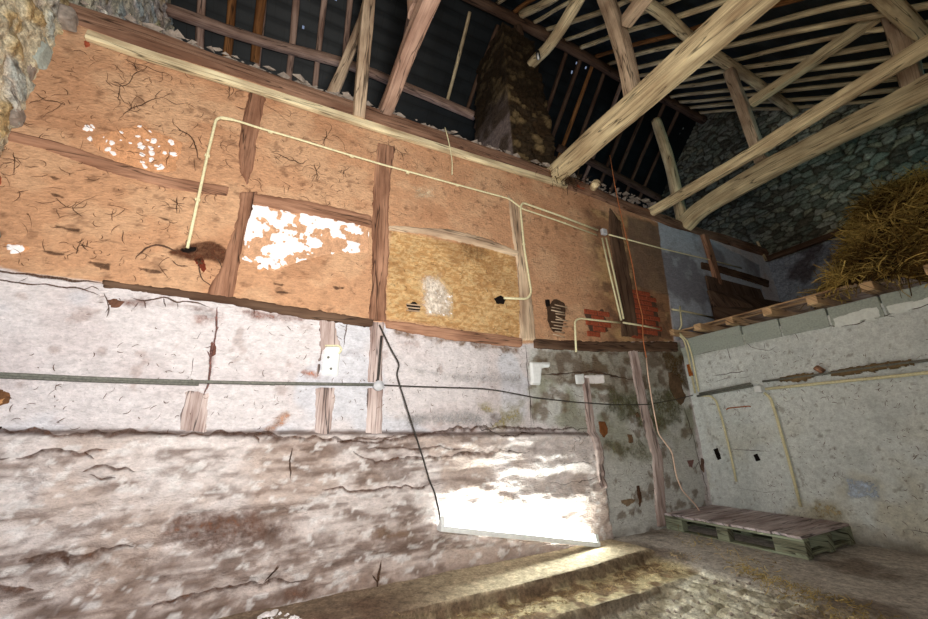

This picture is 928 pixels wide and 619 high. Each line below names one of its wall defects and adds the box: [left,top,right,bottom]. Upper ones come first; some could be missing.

peeling [82,124,183,172]
peeling [242,205,370,272]
crack [0,270,110,316]
crack [131,244,255,395]
flaking render [584,309,611,337]
flaking render [631,289,662,339]
damp [662,352,689,389]
damp [605,388,682,427]